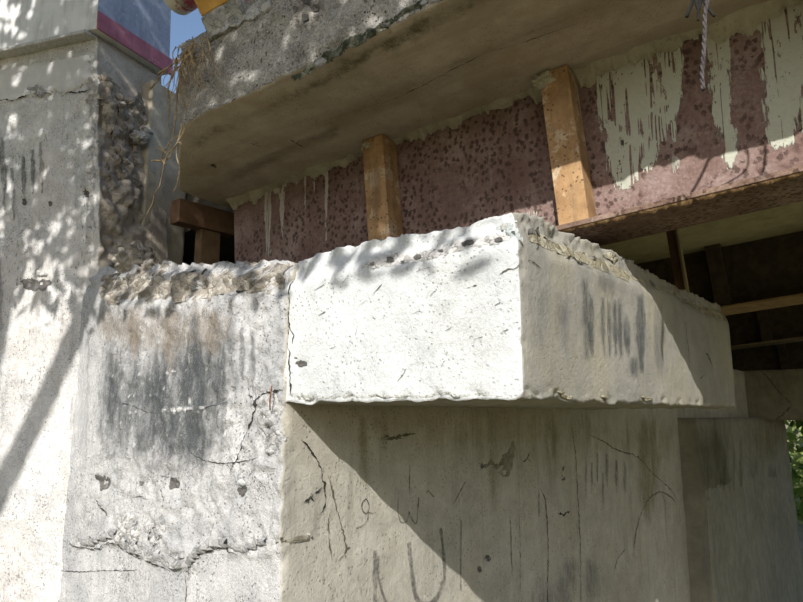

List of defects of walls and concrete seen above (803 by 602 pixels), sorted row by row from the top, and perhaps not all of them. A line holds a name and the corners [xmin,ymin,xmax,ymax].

spalling [291,0,429,81]
damp [0,140,43,216]
spalling [0,54,149,258]
spalling [20,270,51,292]
spalling [98,262,293,306]
damp [589,296,645,373]
damp [103,314,225,459]
crack [122,400,230,434]
crack [189,279,295,476]
flaking render [69,513,312,580]
crack [301,439,350,559]
crack [539,418,680,602]